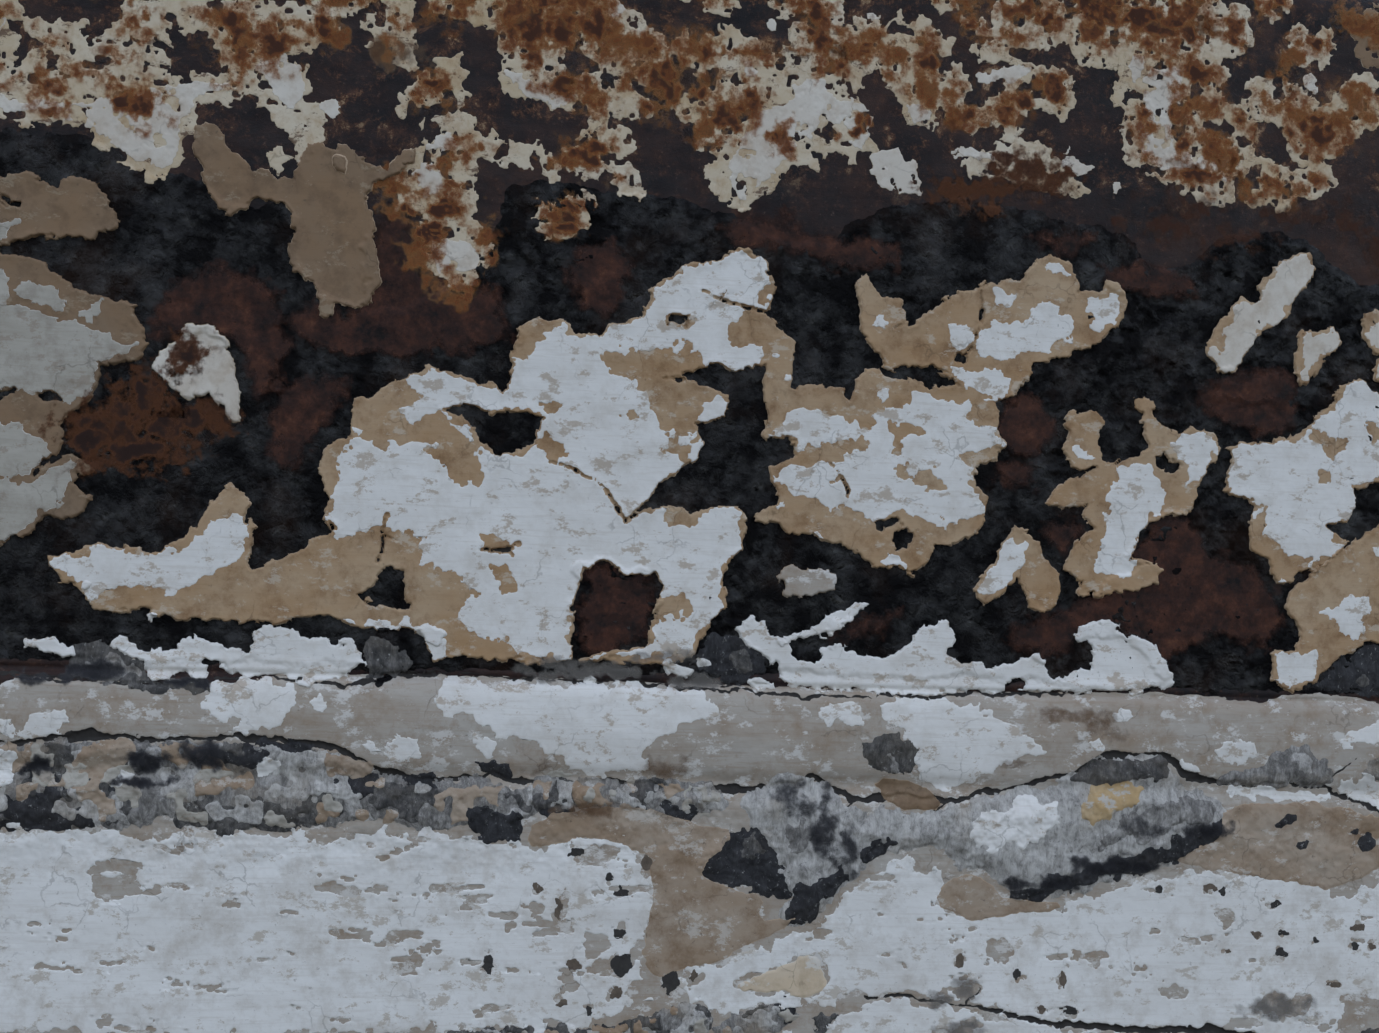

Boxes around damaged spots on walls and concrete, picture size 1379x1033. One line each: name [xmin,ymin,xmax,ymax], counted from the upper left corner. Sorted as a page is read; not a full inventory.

corrosion [0,0,167,137]
peeling [0,0,1379,319]
corrosion [493,0,1069,183]
corrosion [933,0,1379,210]
peeling [0,170,241,547]
corrosion [38,134,513,477]
peeling [0,247,1379,1033]
corrosion [1010,516,1282,660]
crack [0,727,534,785]
crack [805,773,886,807]
crack [933,750,1256,811]
crack [864,987,1254,1033]